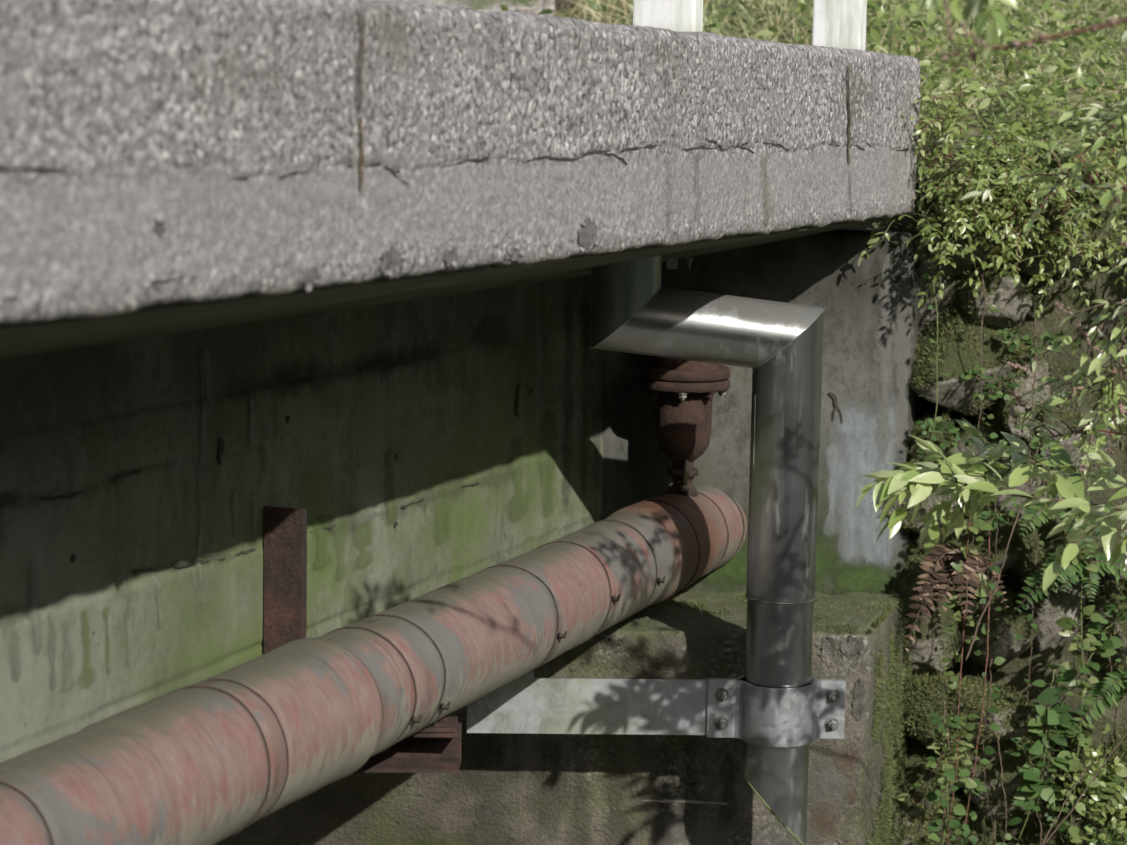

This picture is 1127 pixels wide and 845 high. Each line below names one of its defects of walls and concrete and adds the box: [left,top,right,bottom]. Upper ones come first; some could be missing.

crack [441,139,797,168]
crack [829,143,909,151]
crack [0,168,84,178]
crack [280,171,309,179]
crack [347,162,409,186]
spalling [578,215,598,253]
spalling [381,247,406,278]
crack [133,547,258,573]